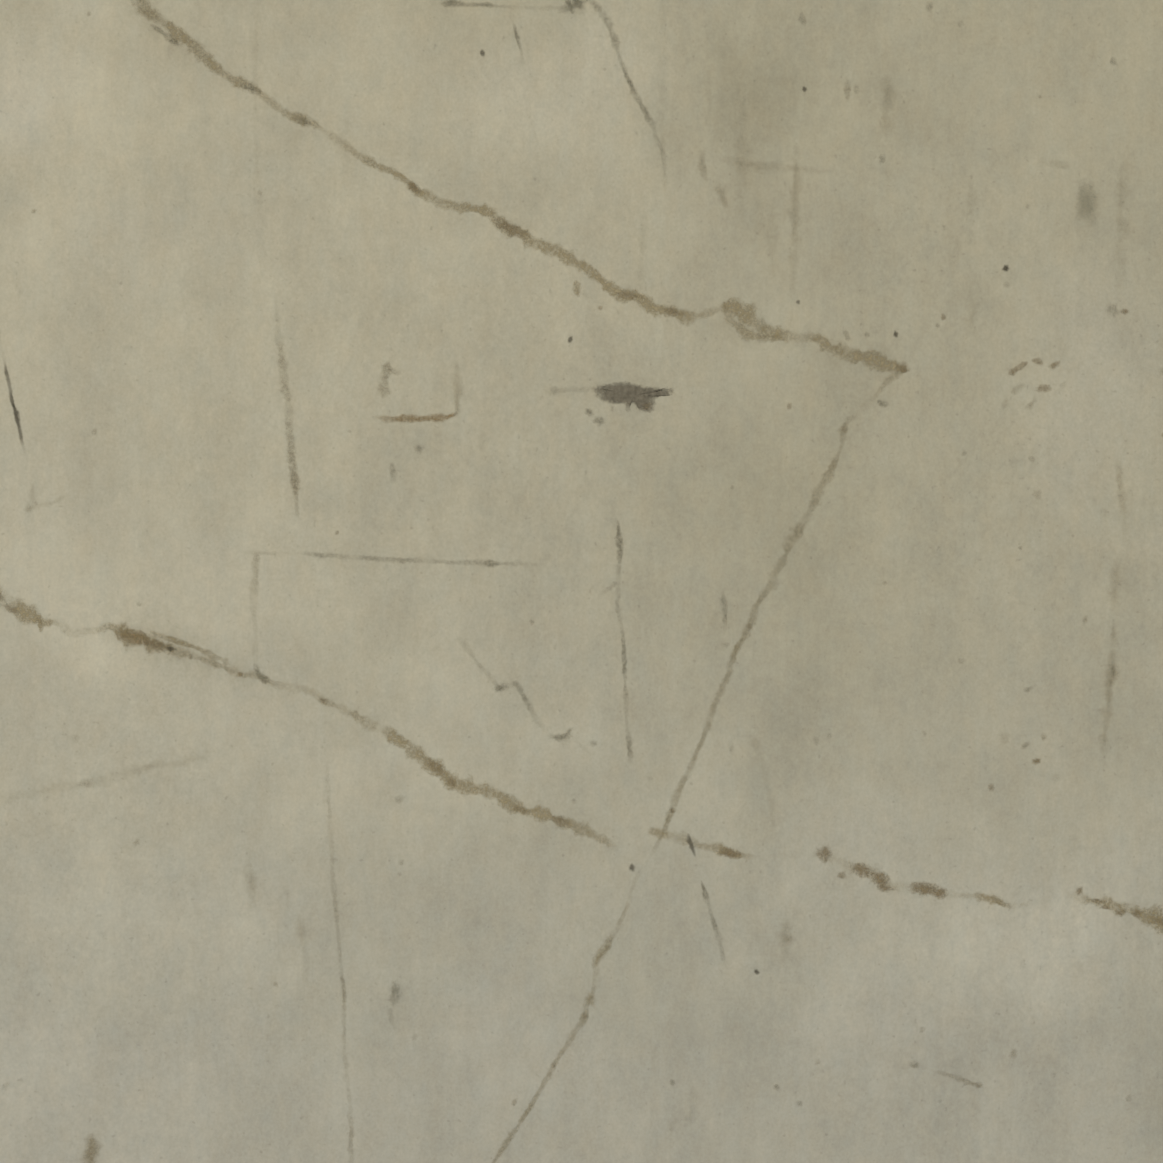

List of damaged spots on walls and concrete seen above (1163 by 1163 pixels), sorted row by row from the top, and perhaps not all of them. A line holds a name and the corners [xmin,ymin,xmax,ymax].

crack [144,10,260,92]
crack [291,114,306,125]
crack [368,158,691,321]
crack [723,302,782,338]
crack [813,336,905,372]
crack [14,603,51,629]
crack [115,625,198,652]
crack [388,730,590,833]
crack [718,845,742,857]
crack [855,864,944,896]
crack [1079,889,1163,930]